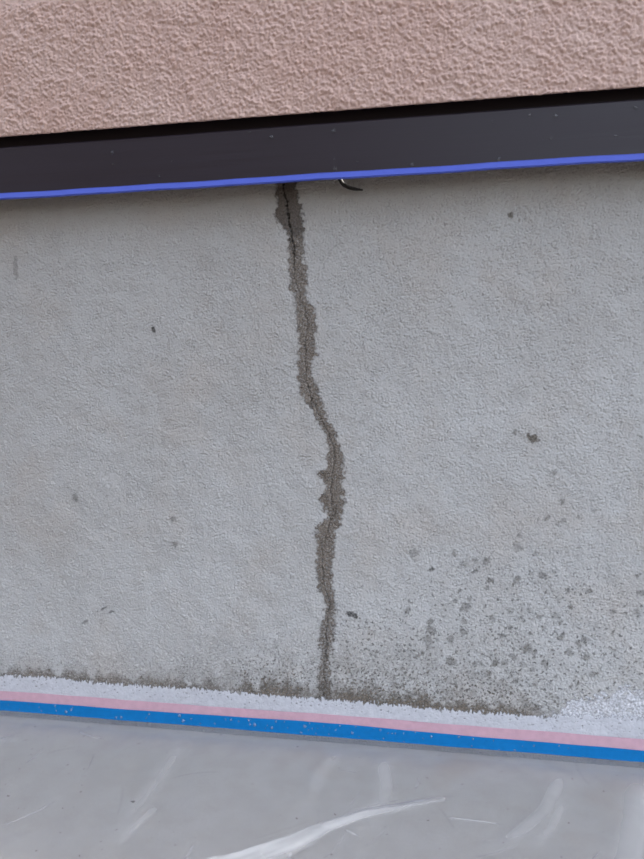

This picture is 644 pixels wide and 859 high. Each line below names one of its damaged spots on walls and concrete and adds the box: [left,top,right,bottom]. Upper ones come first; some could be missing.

crack [282,183,295,263]
damp [235,182,537,716]